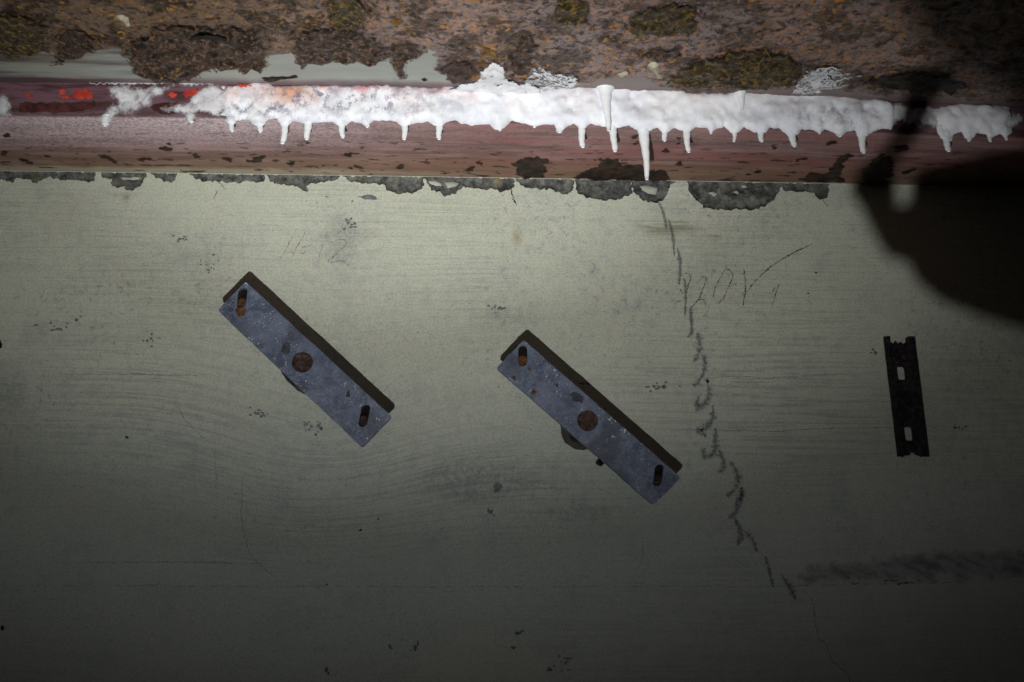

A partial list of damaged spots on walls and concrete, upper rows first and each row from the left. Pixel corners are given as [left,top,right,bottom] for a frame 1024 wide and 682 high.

corrosion [0,0,1024,103]
leakage [219,62,896,180]
leakage [936,103,1013,152]
spalling [0,171,829,211]